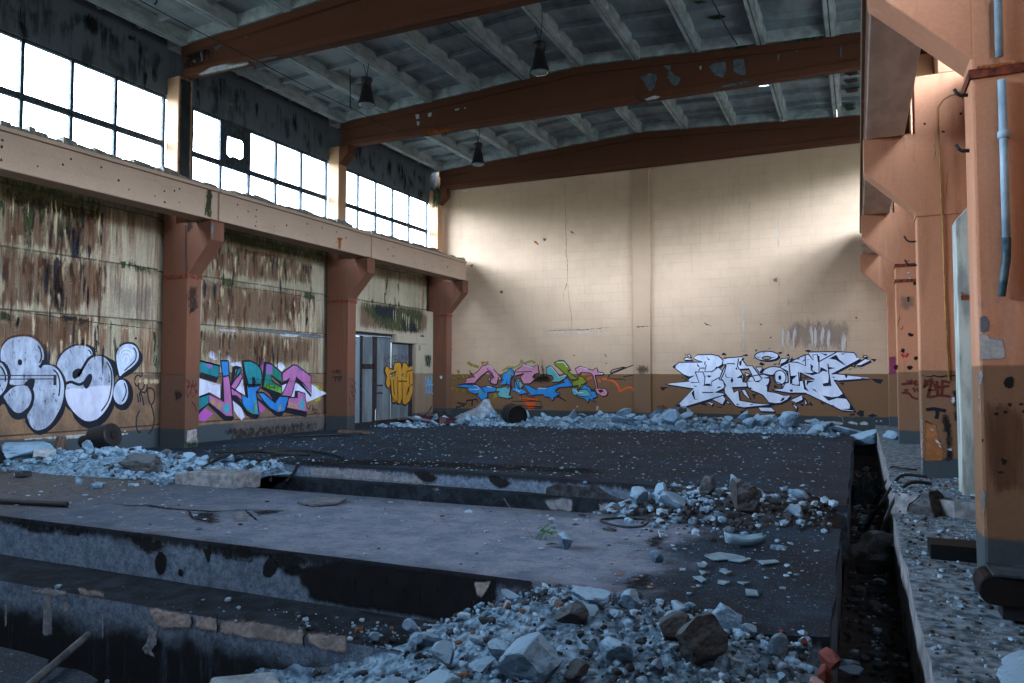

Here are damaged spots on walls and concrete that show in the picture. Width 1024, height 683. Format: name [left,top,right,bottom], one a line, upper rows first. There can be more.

peeling [640,65,681,101]
peeling [699,58,749,88]
water stain [0,194,123,373]
water stain [200,247,315,372]
crack [551,183,611,331]
water stain [810,324,846,351]
peeling [978,303,1005,413]
water stain [986,405,1022,490]